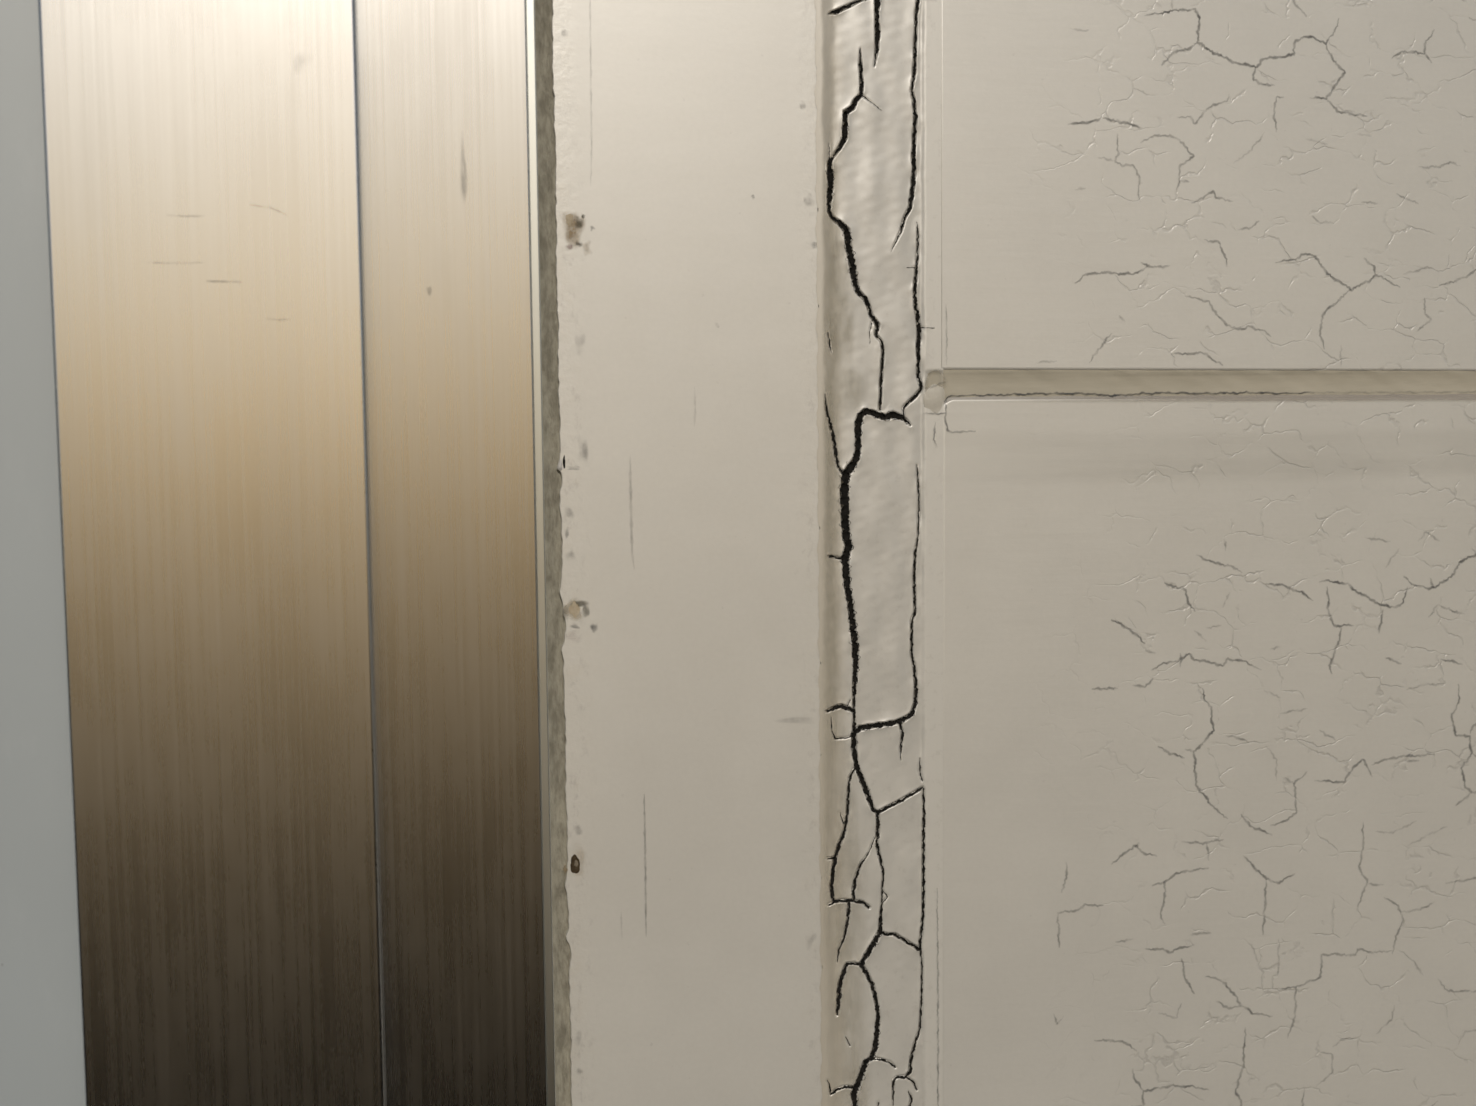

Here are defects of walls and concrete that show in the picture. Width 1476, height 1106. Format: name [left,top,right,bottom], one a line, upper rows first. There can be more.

crack [825,0,1308,1106]